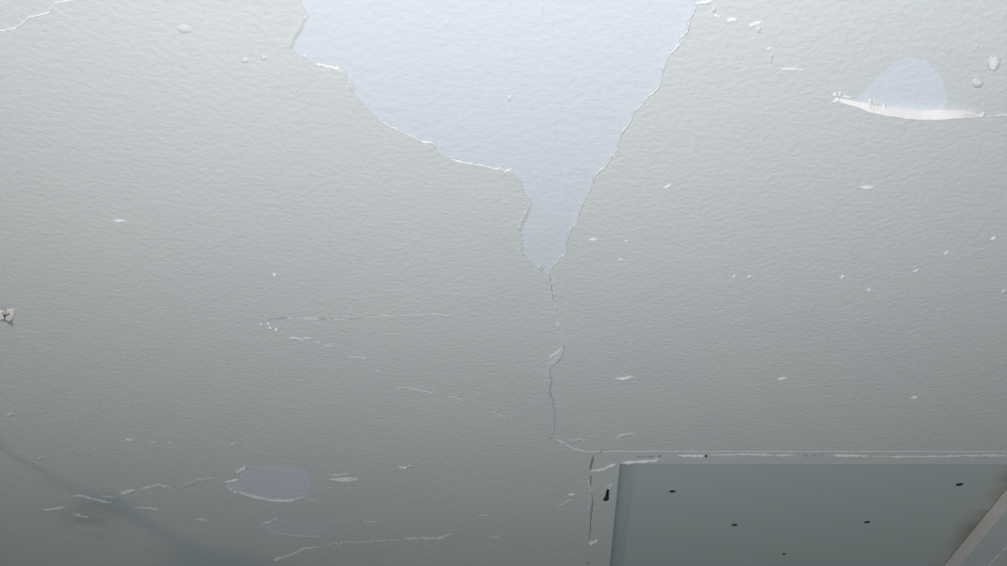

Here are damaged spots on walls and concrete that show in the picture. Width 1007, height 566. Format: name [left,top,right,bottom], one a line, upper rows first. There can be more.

crack [0,0,73,32]
peeling [832,57,984,120]
peeling [289,0,712,274]